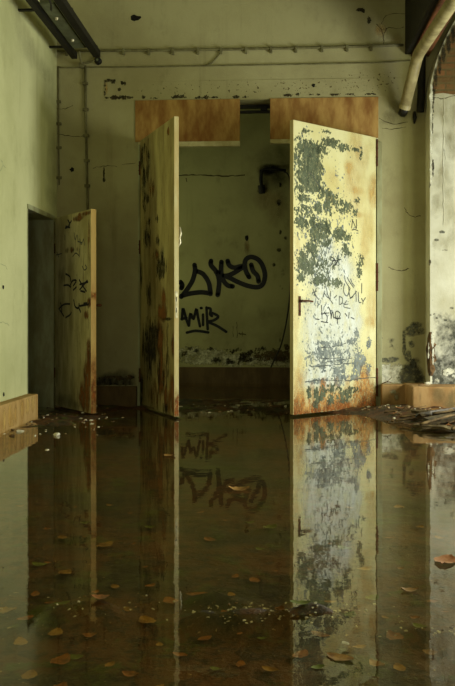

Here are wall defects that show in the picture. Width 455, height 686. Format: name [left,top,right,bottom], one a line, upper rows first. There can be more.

peeling [104,79,133,100]
peeling [294,125,372,410]
rust [79,340,96,413]
rust [151,289,179,416]
rust [294,371,376,415]
damp [382,313,455,384]